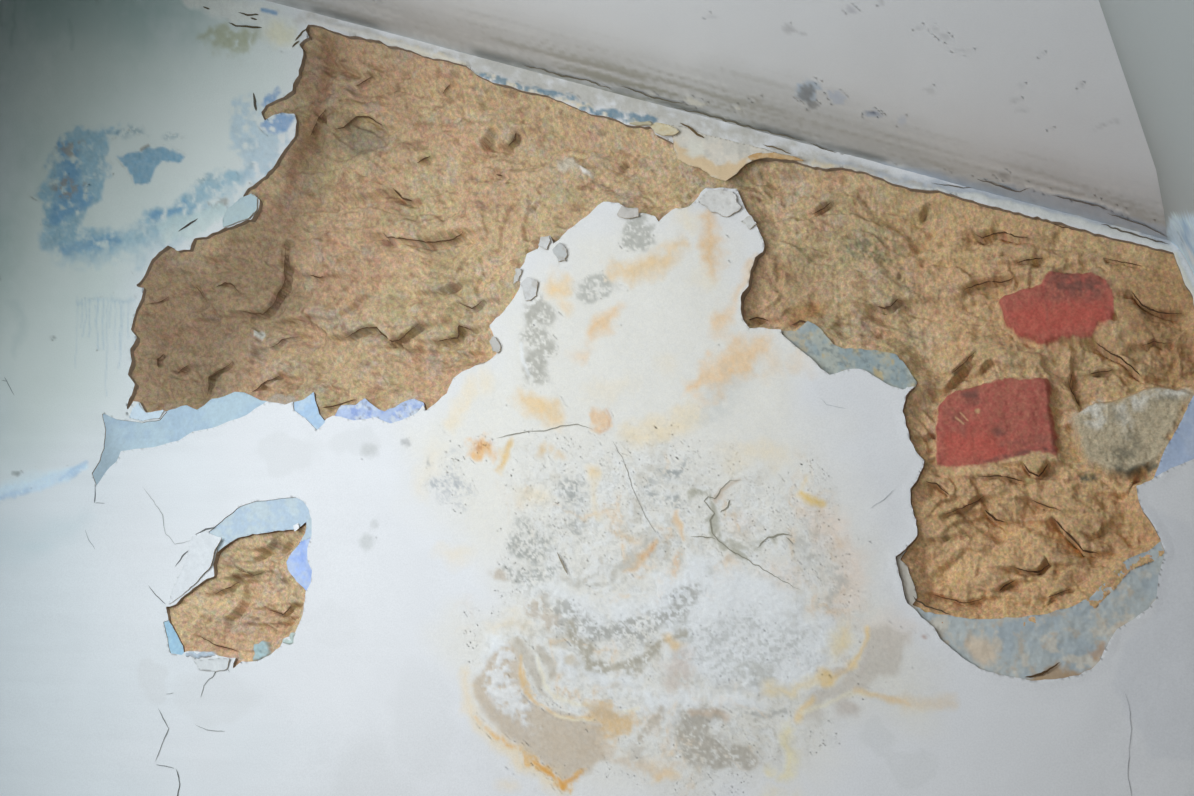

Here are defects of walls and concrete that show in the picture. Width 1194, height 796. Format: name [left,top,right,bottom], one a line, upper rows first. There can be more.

peeling [179,0,306,54]
peeling [31,120,248,275]
spalling [93,17,1194,691]
damp [372,194,962,796]
crack [156,693,180,796]